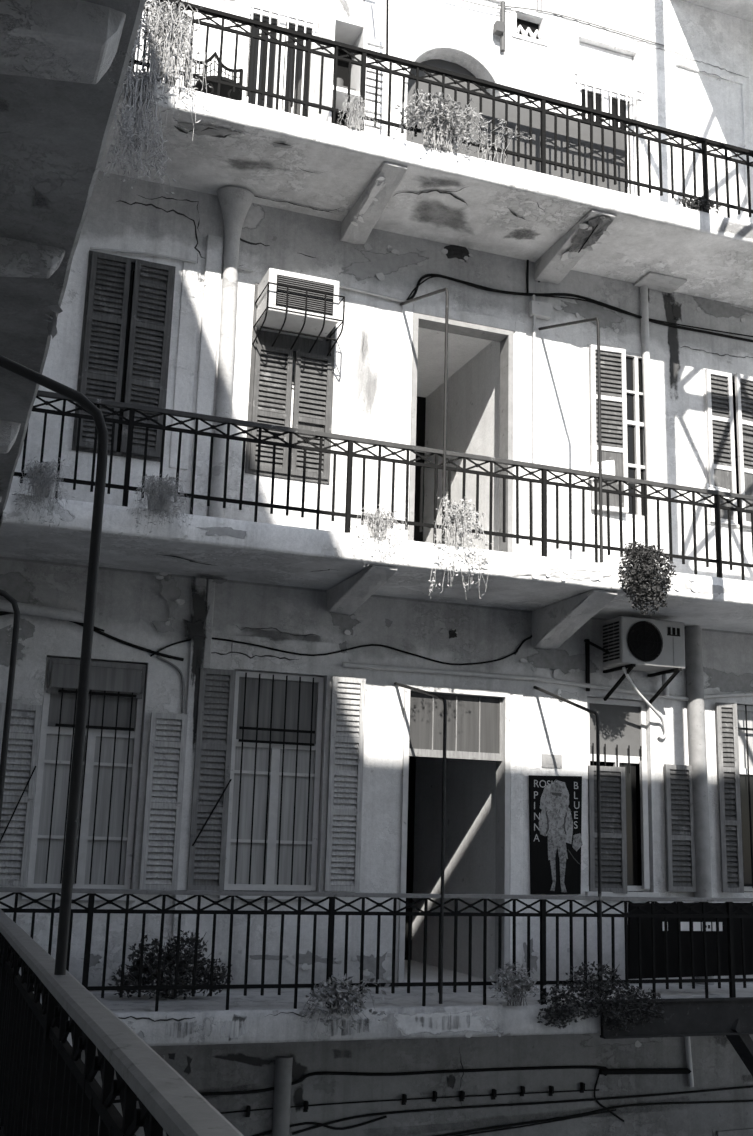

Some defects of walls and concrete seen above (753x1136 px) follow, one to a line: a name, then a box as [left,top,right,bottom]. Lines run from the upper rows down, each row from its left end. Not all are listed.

crack [116,194,204,263]
peeling [351,176,385,226]
peeling [341,243,429,284]
peeling [416,204,465,229]
peeling [424,179,459,188]
spalling [441,245,474,262]
spalling [560,216,613,261]
water stain [358,334,376,409]
peeling [0,618,35,666]
water stain [183,585,209,748]